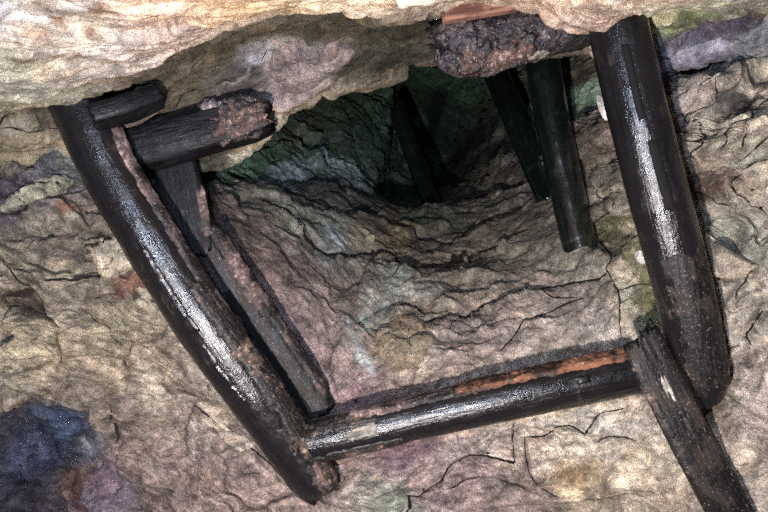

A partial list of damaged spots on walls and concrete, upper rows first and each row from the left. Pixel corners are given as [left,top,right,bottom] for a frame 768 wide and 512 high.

crack [262,188,523,276]
crack [353,300,496,335]
crack [500,180,650,351]
crack [405,408,635,512]